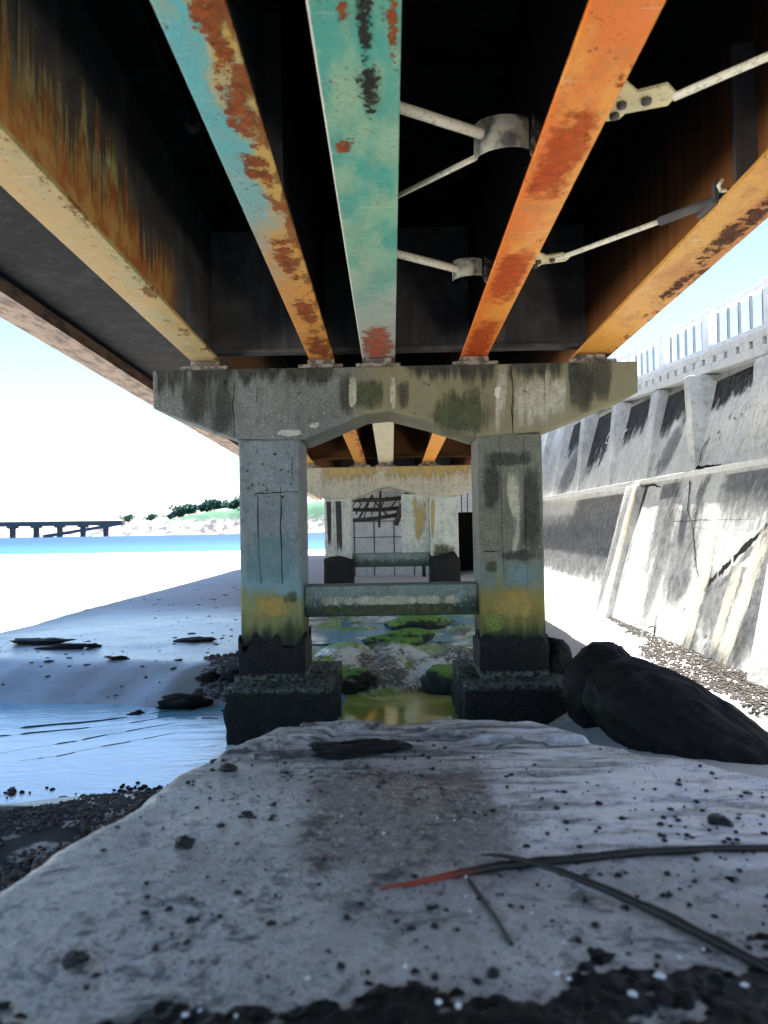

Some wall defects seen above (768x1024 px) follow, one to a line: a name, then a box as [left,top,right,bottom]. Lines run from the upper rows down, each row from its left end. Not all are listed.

rust [0,0,174,308]
rust [187,0,276,198]
rust [335,138,355,153]
rust [335,0,399,120]
rust [653,197,768,303]
crack [499,375,526,522]
damp [484,453,632,611]
damp [583,411,612,478]
damp [659,389,686,438]
damp [639,468,768,668]
crack [674,437,768,593]
damp [711,365,754,410]